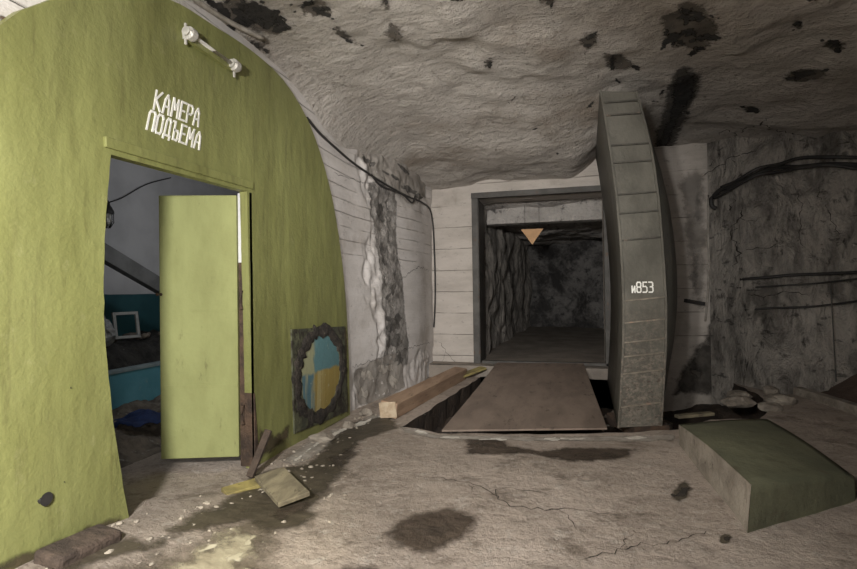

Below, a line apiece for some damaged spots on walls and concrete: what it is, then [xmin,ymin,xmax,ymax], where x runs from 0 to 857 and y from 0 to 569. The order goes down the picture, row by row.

leakage [652,74,697,147]
leakage [53,414,674,569]
crack [441,477,616,526]
crack [580,531,706,560]